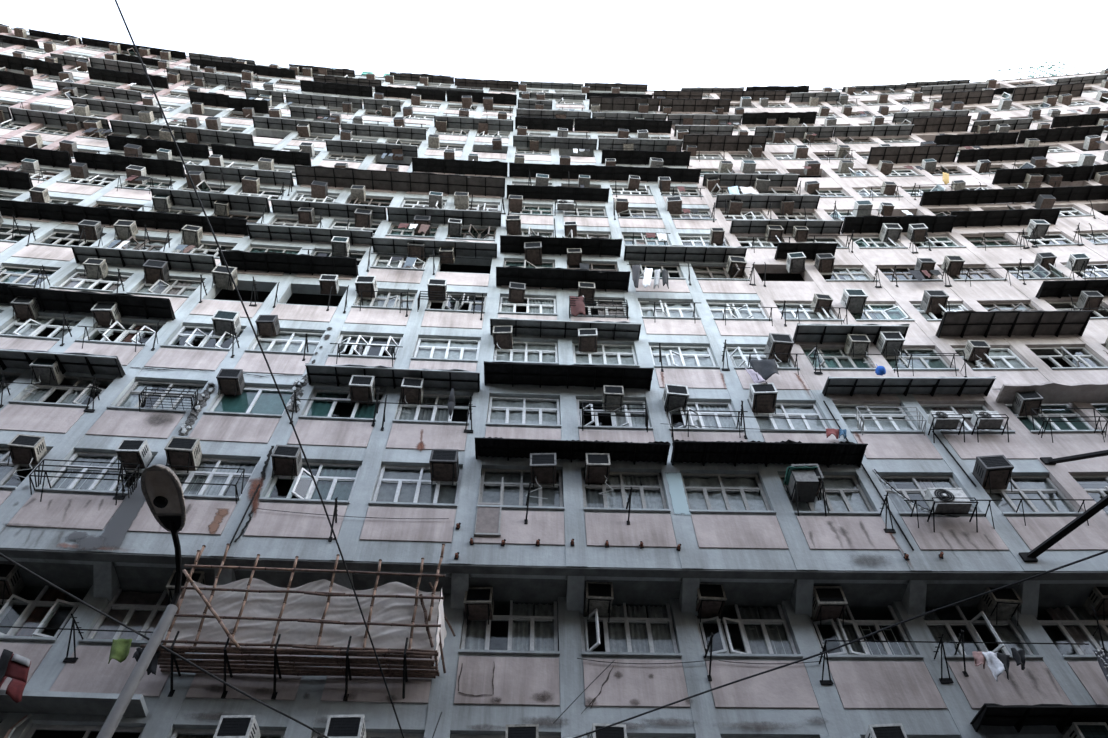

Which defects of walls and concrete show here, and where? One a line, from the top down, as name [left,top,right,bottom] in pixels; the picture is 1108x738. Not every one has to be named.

rust [248,479,262,511]